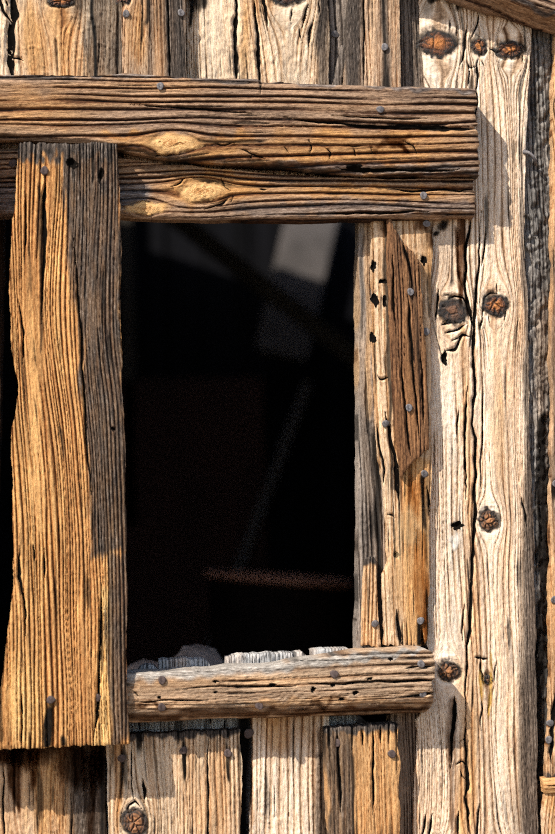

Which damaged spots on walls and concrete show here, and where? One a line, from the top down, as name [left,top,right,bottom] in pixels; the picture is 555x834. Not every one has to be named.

crack [0,0,22,75]
crack [132,104,246,113]
crack [285,15,495,215]
crack [376,212,509,834]